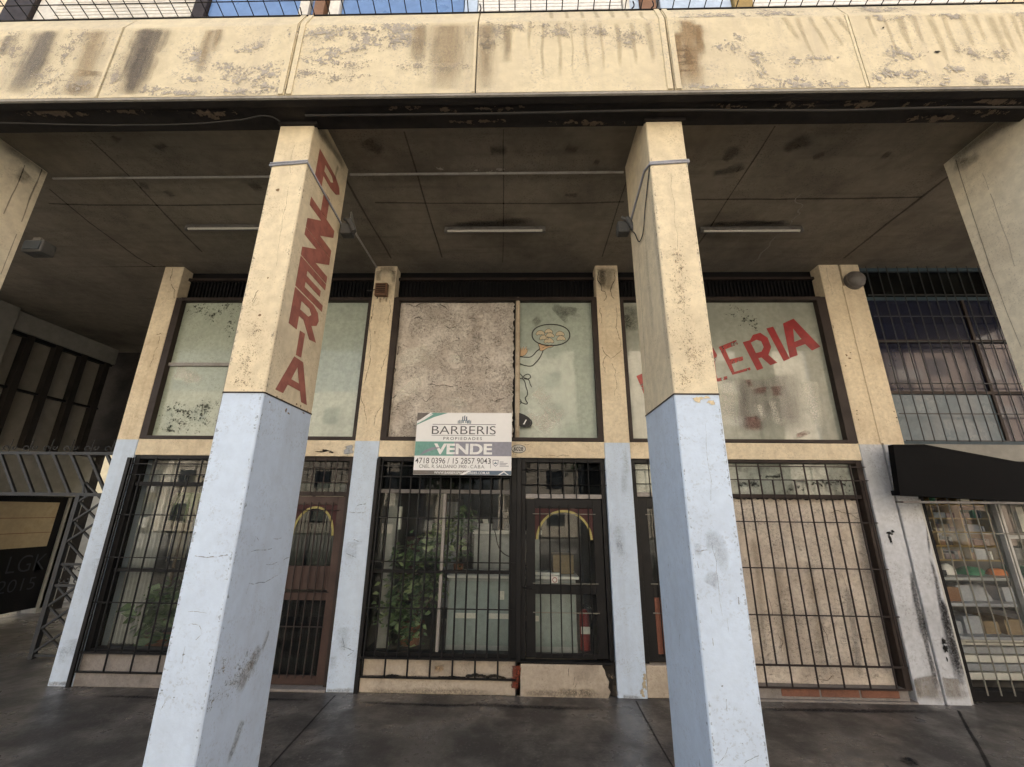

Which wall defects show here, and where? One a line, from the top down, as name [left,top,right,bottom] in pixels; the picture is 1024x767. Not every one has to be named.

leakage [16,33,50,83]
leakage [127,30,161,88]
peeling [139,23,473,96]
leakage [911,565,963,697]